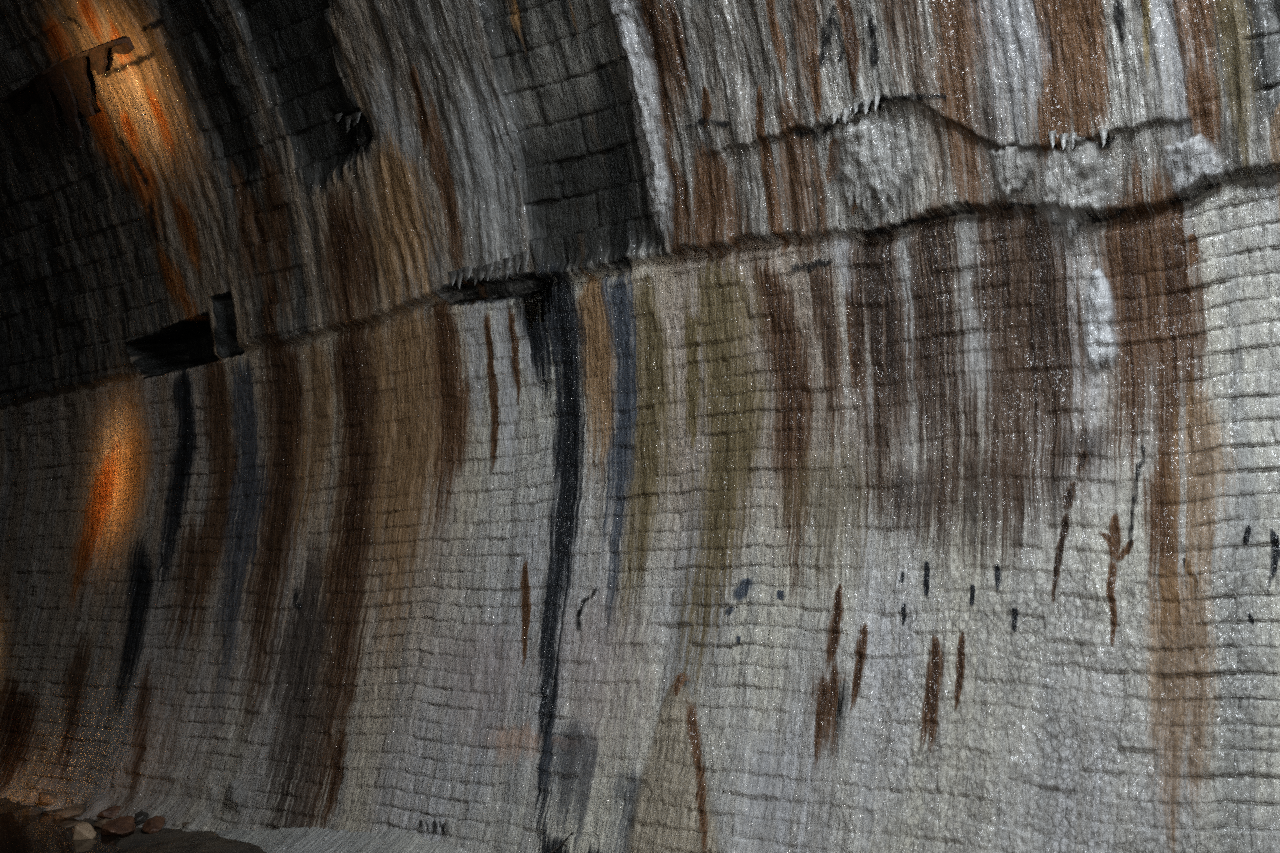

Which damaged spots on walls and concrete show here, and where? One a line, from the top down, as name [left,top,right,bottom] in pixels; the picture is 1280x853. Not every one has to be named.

spalling [161,0,260,190]
crack [685,118,729,129]
crack [794,6,947,140]
crack [865,201,1126,238]
crack [1080,136,1116,149]
corrosion [1173,0,1253,166]
spalling [126,291,245,379]
corrosion [242,64,485,829]
corrosion [484,313,499,468]
water stain [602,272,637,620]
corrosion [618,0,1224,850]
water stain [498,261,587,853]